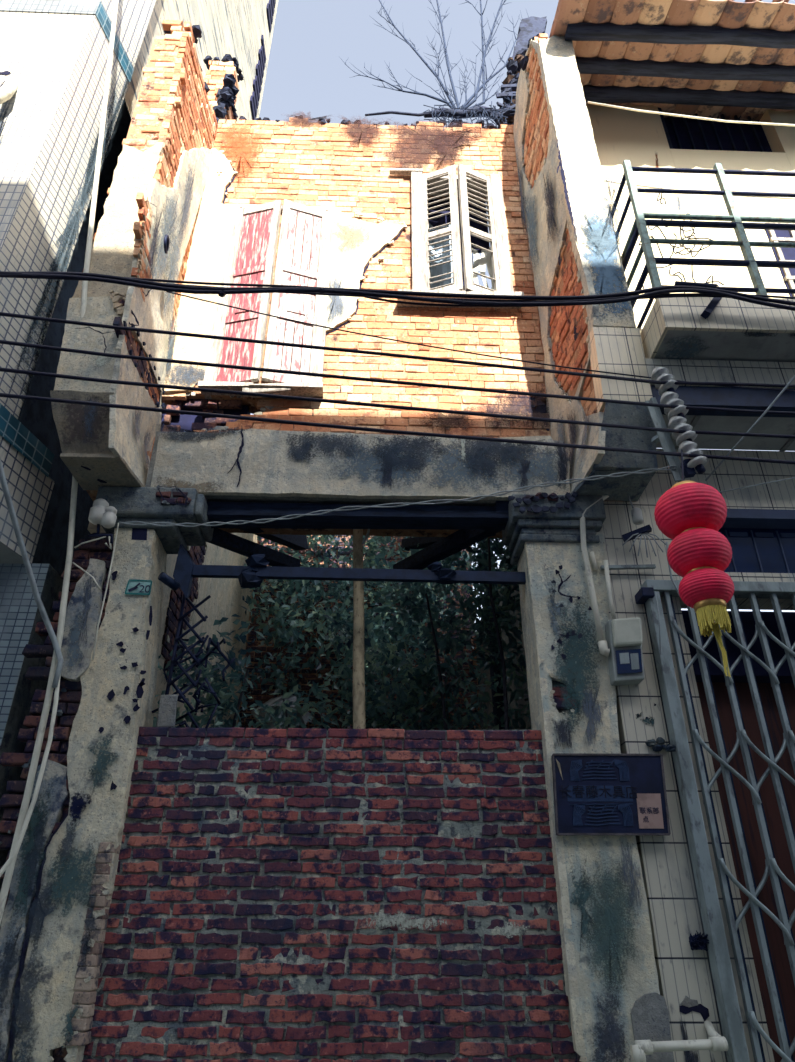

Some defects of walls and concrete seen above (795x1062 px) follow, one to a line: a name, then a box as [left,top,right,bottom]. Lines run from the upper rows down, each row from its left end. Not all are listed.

damp [426,132,472,169]
spalling [521,37,550,188]
spalling [108,192,243,436]
flaking render [326,218,407,334]
spalling [546,222,590,403]
crack [227,426,244,487]
damp [286,411,589,492]
flaking render [107,641,146,724]
damp [547,584,603,747]
damp [0,733,118,1062]
spalling [47,836,121,1062]
damp [570,845,644,1062]